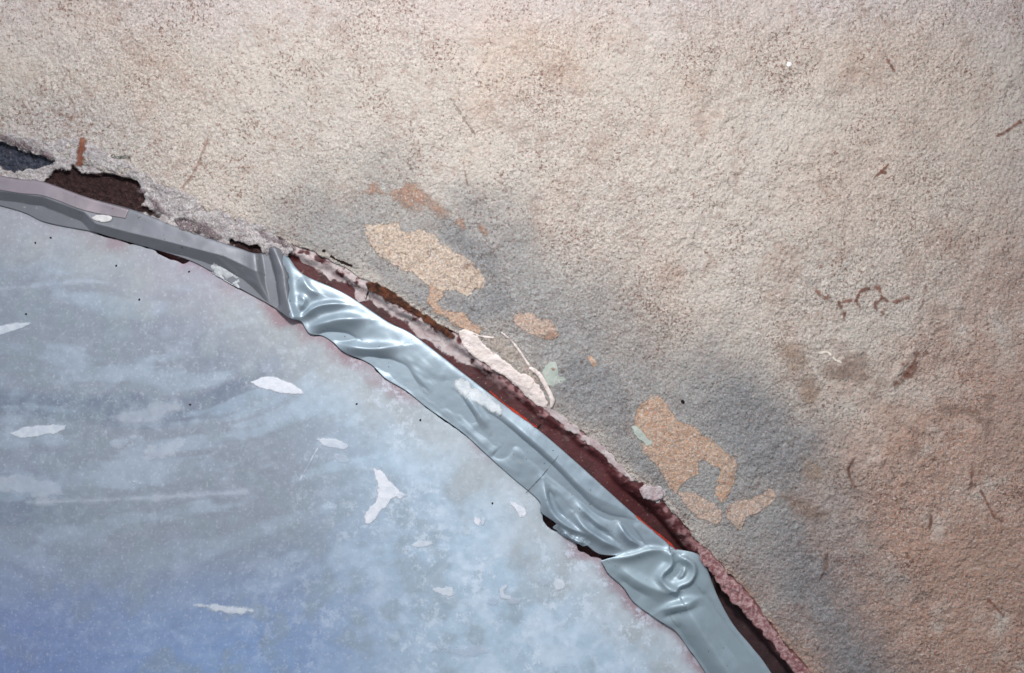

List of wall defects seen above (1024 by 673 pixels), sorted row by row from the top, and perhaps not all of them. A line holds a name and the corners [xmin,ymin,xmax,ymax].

corrosion [364,183,446,214]
spalling [0,130,634,481]
corrosion [366,282,455,339]
peeling [634,396,776,530]